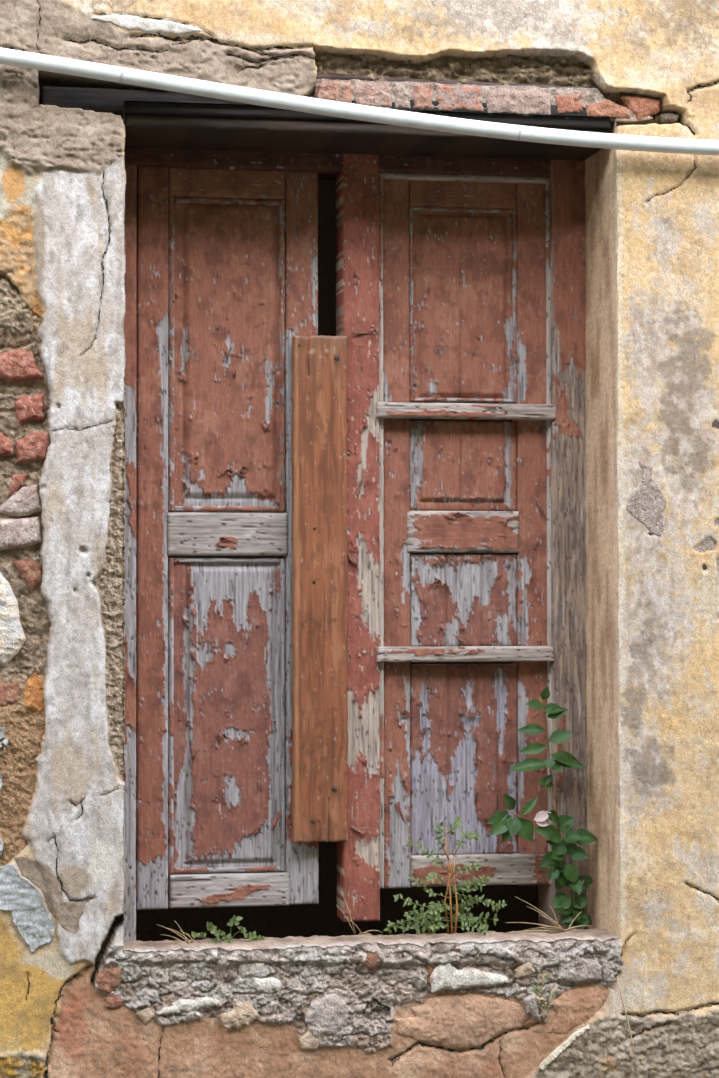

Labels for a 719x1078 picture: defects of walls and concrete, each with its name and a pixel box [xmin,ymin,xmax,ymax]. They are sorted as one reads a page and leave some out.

peeling [92,14,203,36]
crack [681,81,719,135]
peeling [626,461,667,536]
peeling [694,519,719,578]
spalling [0,276,90,952]
flaking render [539,1025,590,1070]